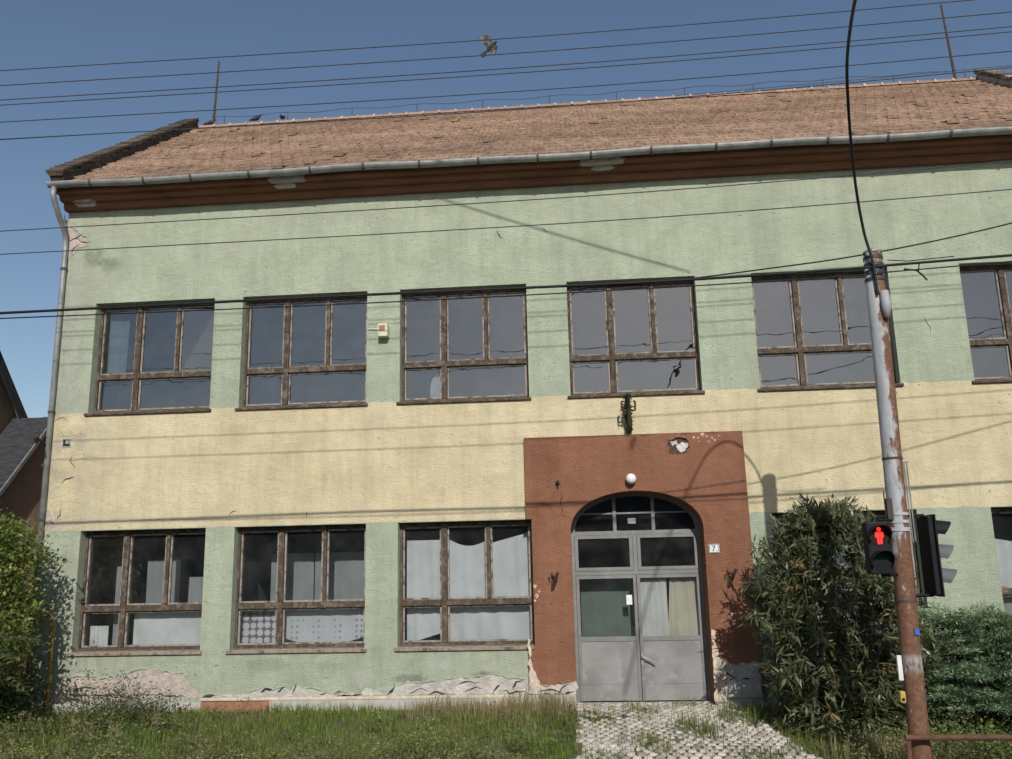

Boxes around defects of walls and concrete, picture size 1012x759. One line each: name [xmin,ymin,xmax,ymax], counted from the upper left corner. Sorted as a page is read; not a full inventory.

spalling [49,638,579,704]
spalling [711,629,765,705]